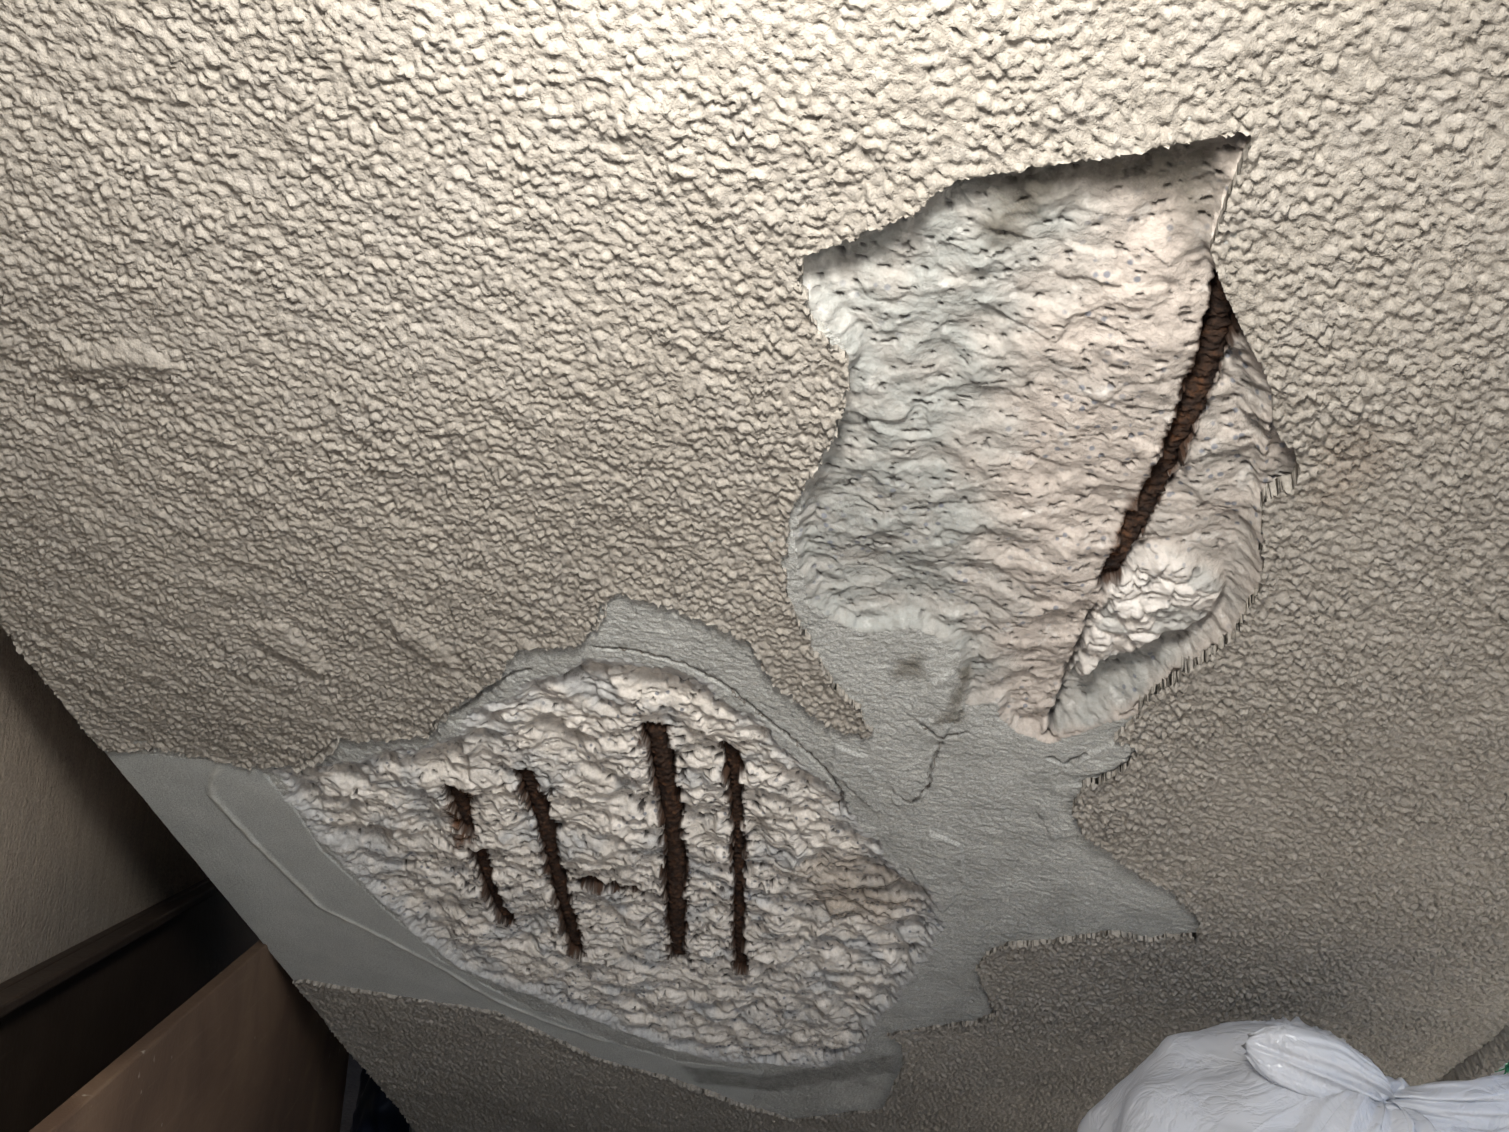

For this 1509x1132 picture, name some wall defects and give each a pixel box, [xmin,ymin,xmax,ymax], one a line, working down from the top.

corrosion [446,790,473,849]
spalling [104,132,1297,1119]